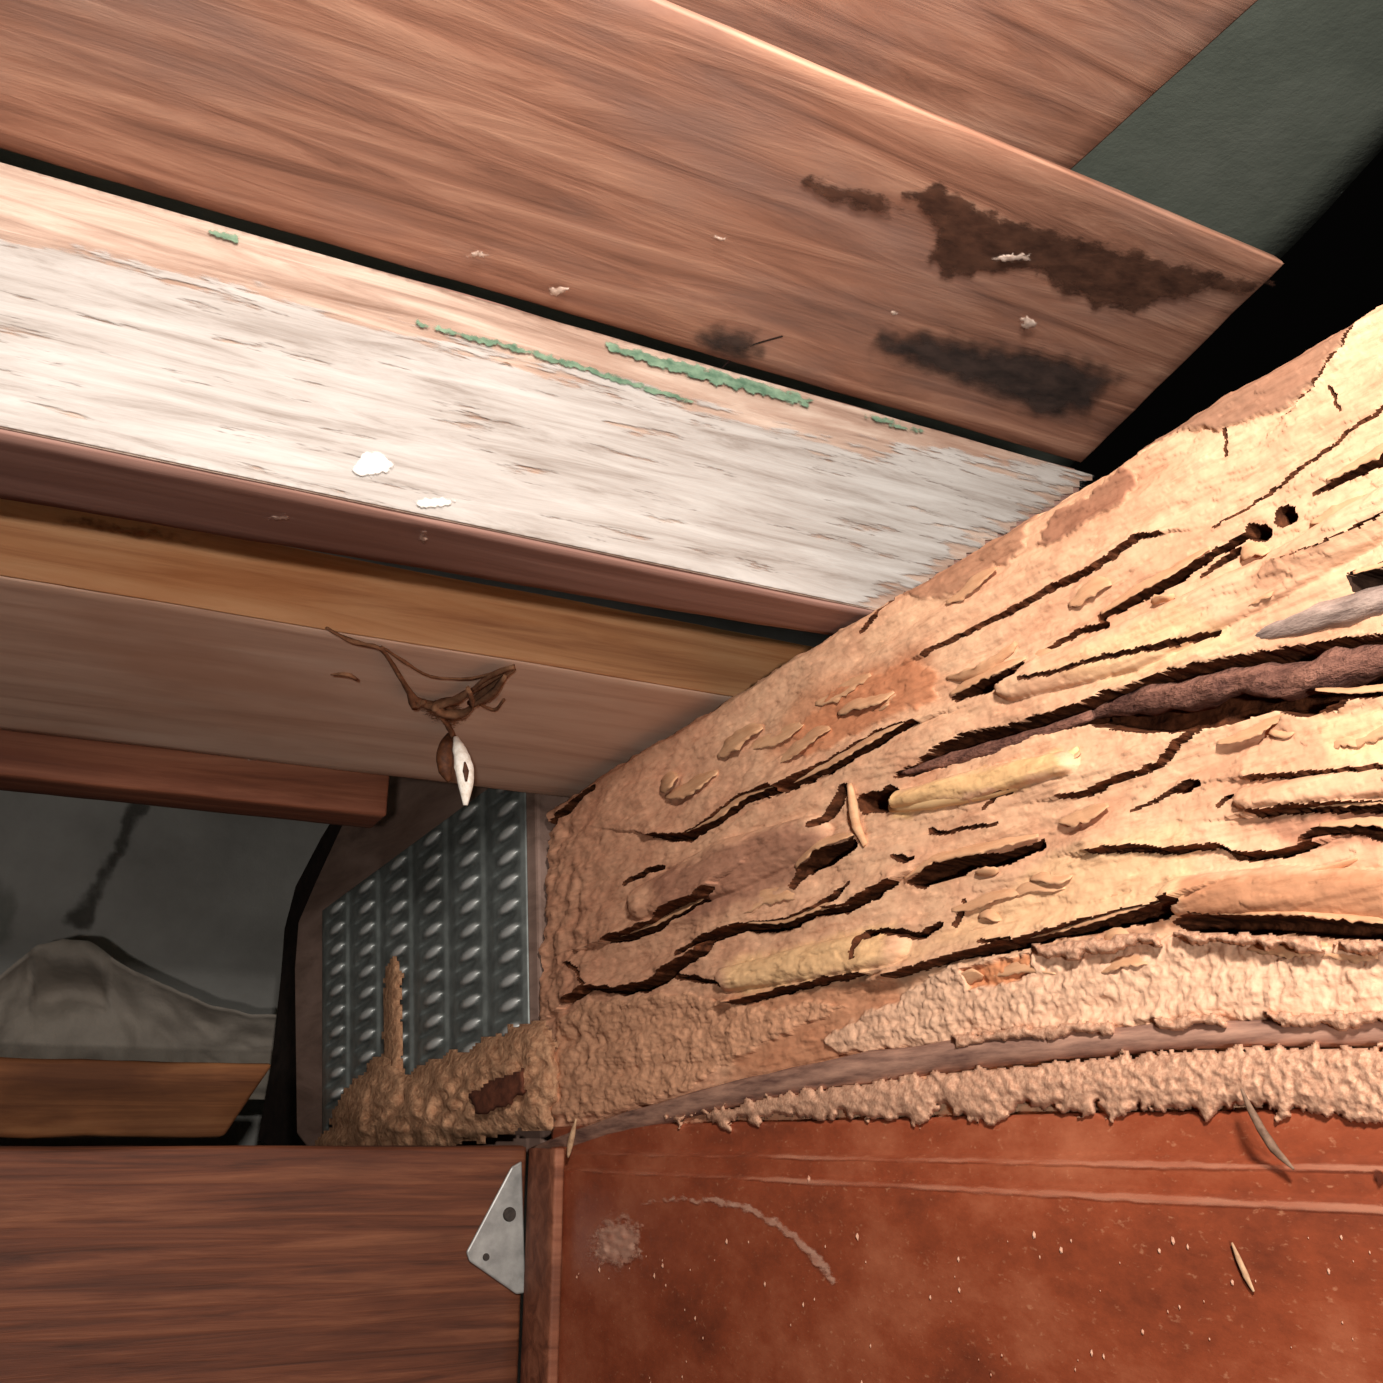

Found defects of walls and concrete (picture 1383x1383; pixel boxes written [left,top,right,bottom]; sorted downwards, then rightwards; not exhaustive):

water stain [801,175,1274,313]
water stain [877,332,1112,415]
crack [1211,325,1383,529]
crack [859,597,895,634]
crack [919,530,1164,658]
crack [1272,511,1383,560]
crack [1284,684,1383,715]
crack [549,784,596,825]
crack [1054,730,1383,863]
crack [560,770,1179,1005]